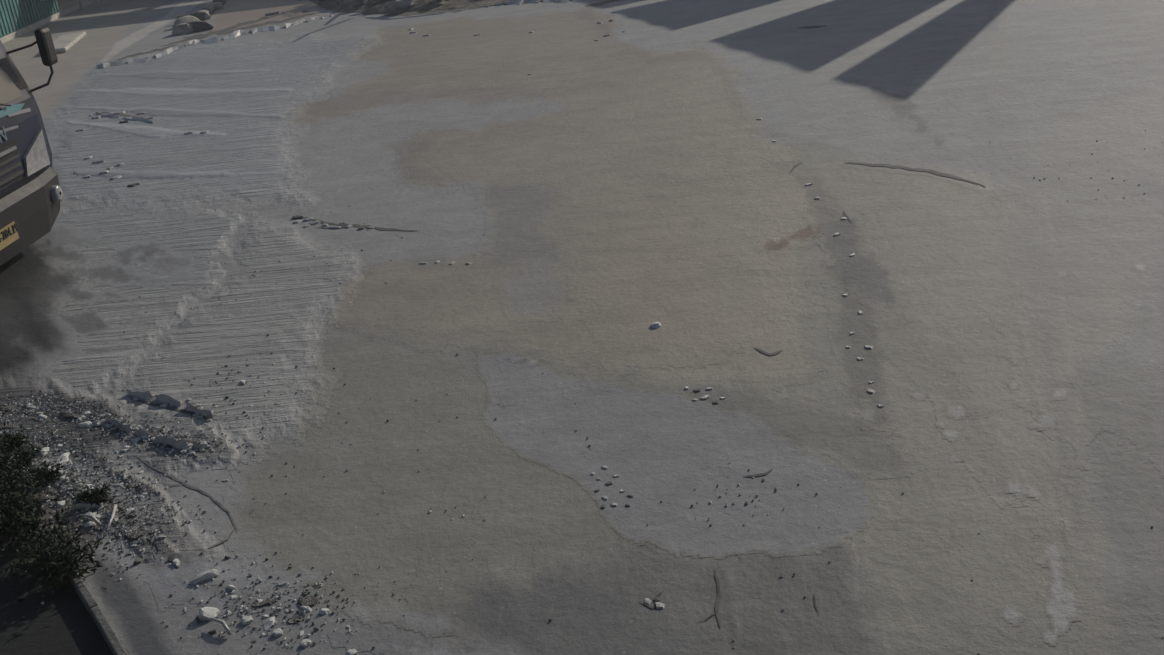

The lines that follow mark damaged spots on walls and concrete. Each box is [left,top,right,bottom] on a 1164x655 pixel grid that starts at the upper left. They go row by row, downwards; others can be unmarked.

spalling [96,13,333,69]
damp [42,4,860,655]
damp [402,0,1164,655]
spalling [127,389,213,422]
spalling [97,414,215,455]